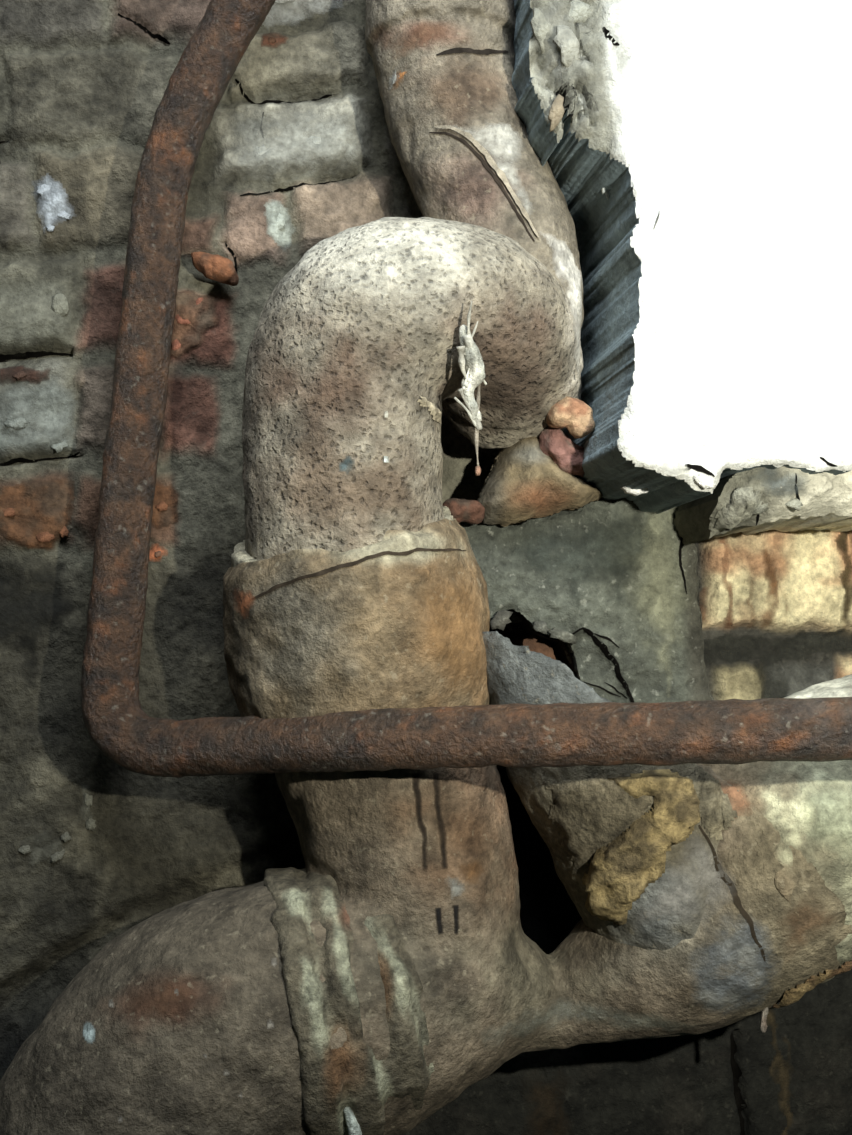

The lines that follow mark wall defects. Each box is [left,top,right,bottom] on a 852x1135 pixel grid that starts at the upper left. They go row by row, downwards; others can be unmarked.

peeling [490,610,513,631]
peeling [532,621,577,644]
crack [573,627,634,703]